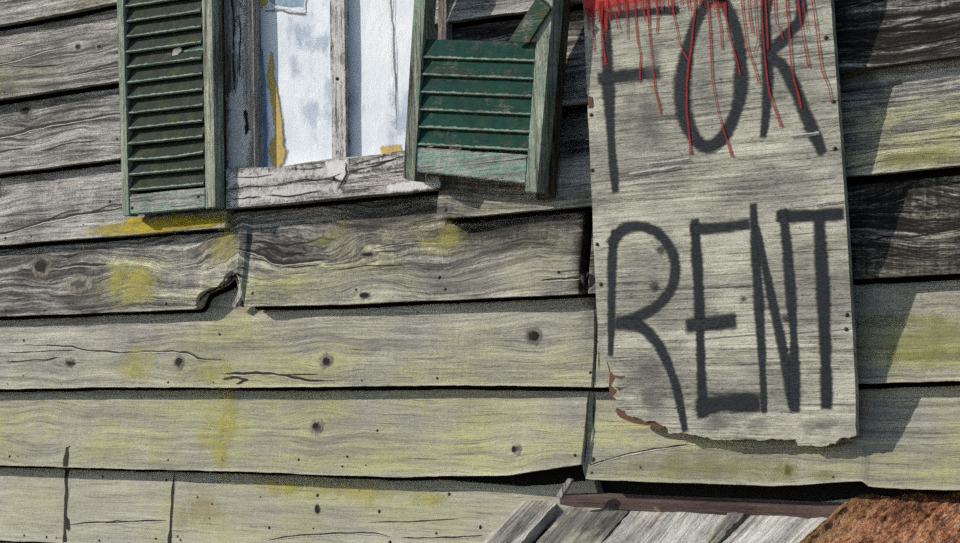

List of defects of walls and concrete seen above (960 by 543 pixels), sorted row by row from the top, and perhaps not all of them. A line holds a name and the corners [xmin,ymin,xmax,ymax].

damp [94,215,227,235]
crack [7,344,334,384]
crack [63,446,174,543]